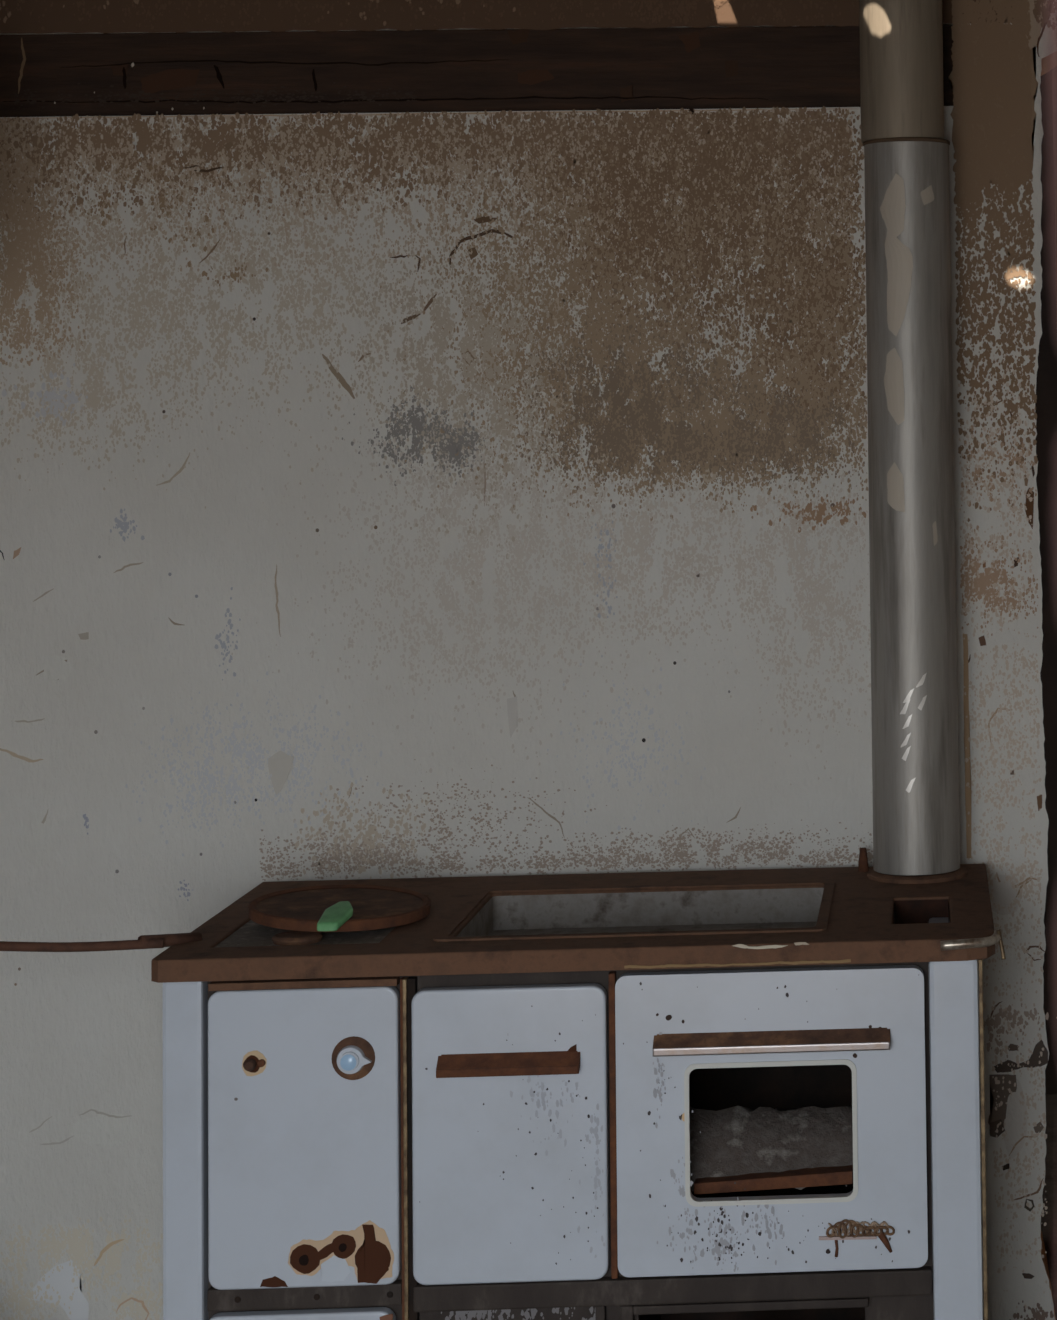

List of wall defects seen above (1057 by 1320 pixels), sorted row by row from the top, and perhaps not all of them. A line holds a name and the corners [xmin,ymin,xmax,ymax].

water stain [0,122,873,881]
flaking render [1025,466,1035,530]
flaking render [984,1003,1049,1138]
water stain [0,1212,163,1320]